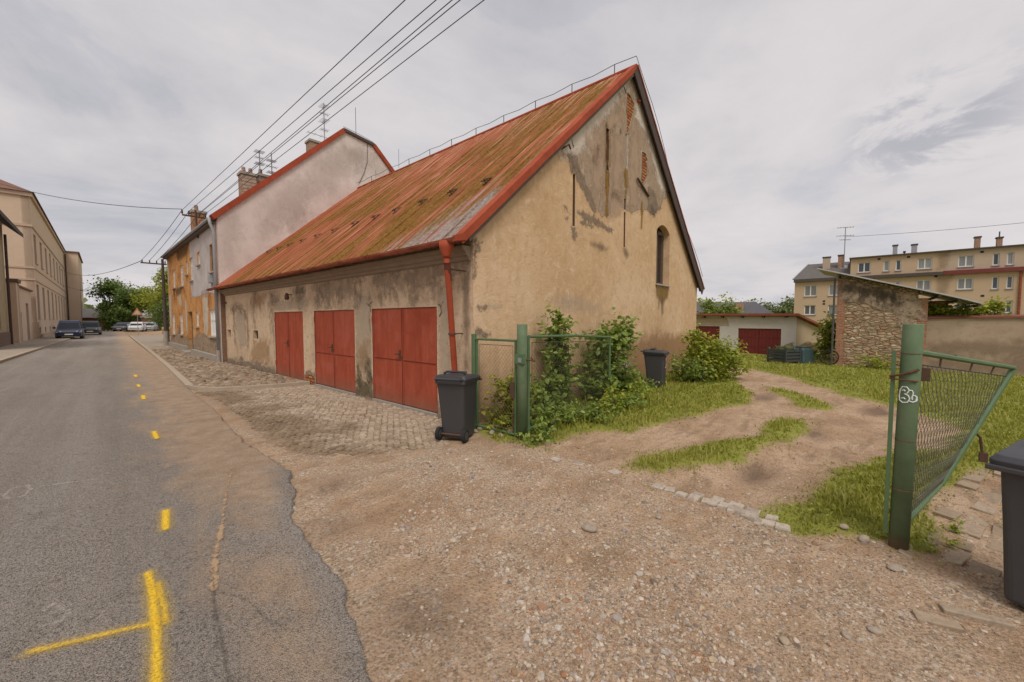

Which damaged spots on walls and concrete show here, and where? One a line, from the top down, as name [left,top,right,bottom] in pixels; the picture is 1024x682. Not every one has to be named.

flaking render [559,77,669,241]
damp [656,286,668,313]
damp [356,361,373,398]